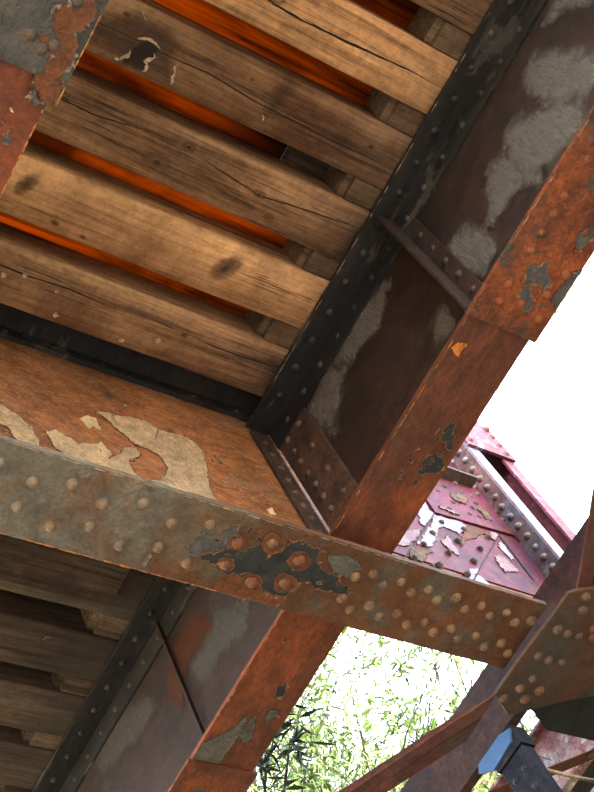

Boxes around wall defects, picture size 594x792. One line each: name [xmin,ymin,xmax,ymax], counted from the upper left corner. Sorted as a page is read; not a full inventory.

rust [19,0,105,113]
crack [268,0,441,88]
rust [0,122,37,197]
peeling [514,261,583,314]
rust [435,339,467,369]
peeling [0,403,223,501]
peeling [187,508,362,599]
peeling [398,501,466,556]
rust [449,492,467,505]
peeling [469,568,493,586]
peeling [490,531,519,573]
peeling [192,682,290,764]